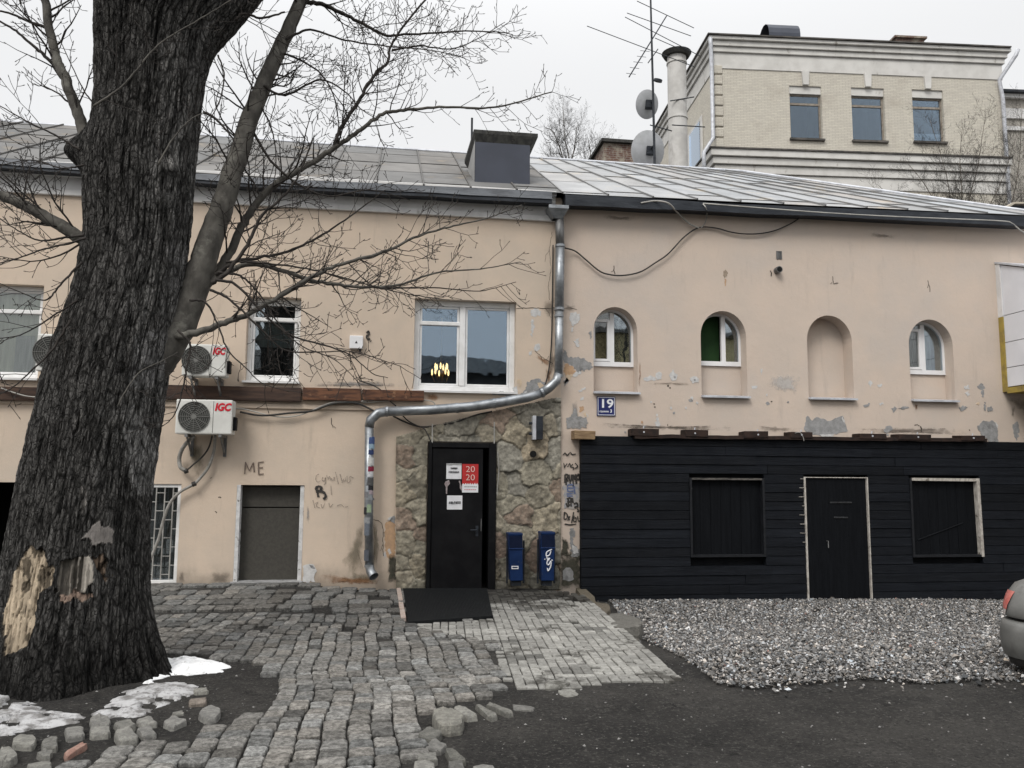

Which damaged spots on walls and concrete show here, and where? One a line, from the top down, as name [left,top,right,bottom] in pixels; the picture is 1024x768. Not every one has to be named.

flaking render [563,312,593,429]
peeling [804,416,848,437]
peeling [959,383,998,442]
water stain [350,541,360,562]